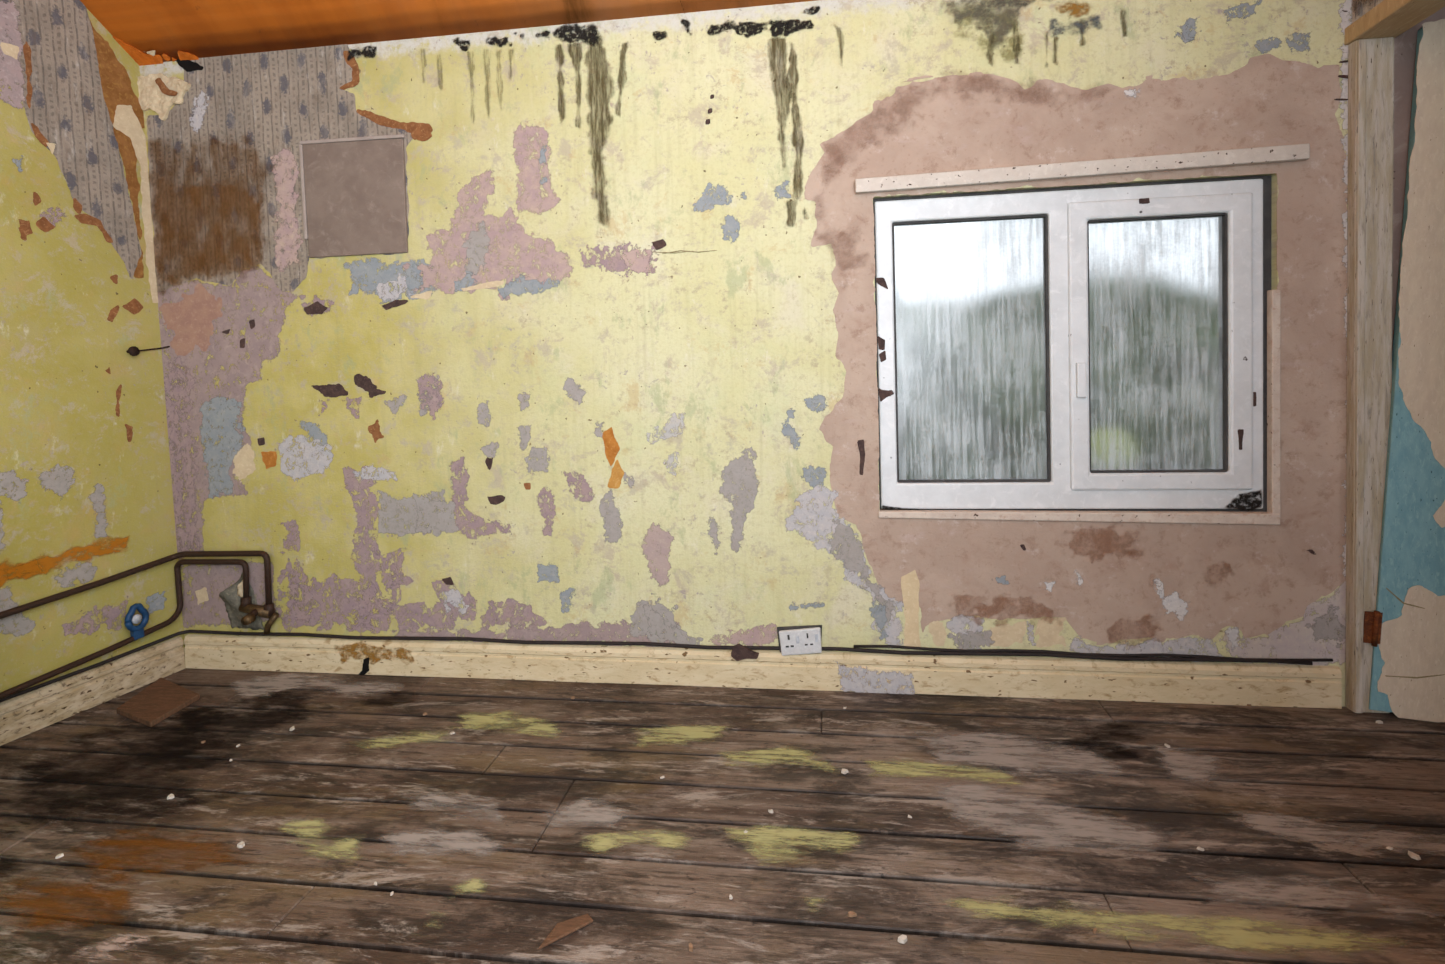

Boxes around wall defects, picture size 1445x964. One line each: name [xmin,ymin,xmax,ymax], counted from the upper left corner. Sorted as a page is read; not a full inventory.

damp [347,46,377,61]
damp [947,0,1028,63]
damp [1046,3,1100,63]
damp [681,6,820,226]
peeling [19,192,67,240]
peeling [88,21,778,675]
flaking render [774,0,1352,666]
peeling [0,464,76,549]
rust [0,537,128,587]
peeling [54,562,97,588]
peeling [0,586,36,637]
peeling [1377,585,1445,722]